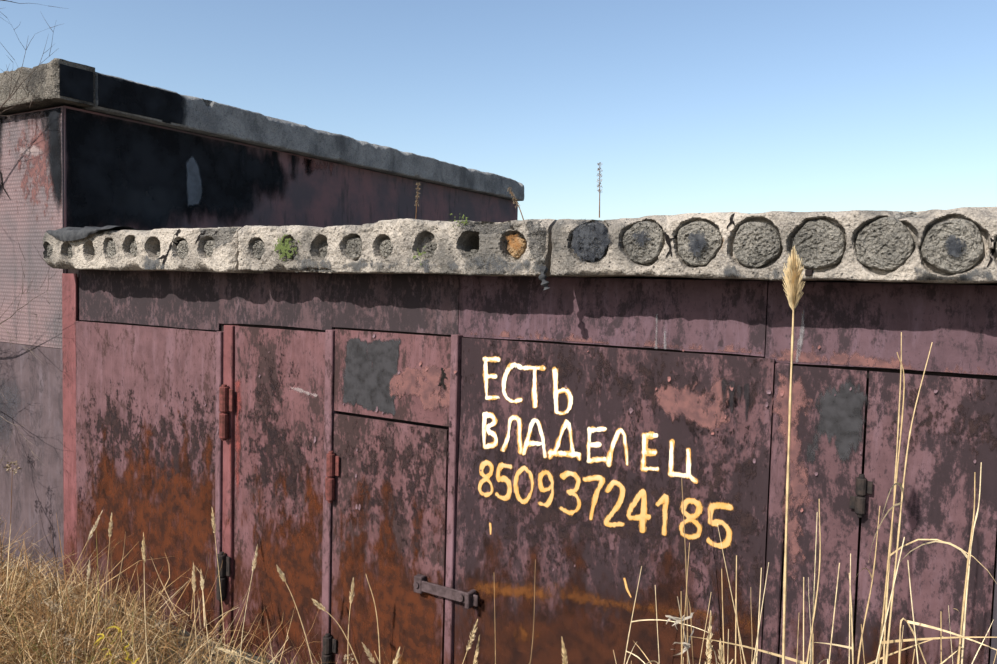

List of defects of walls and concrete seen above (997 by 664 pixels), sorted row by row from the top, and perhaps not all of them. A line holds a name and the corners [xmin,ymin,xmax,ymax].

water stain [20,145,42,157]
corrosion [77,424,215,638]
corrosion [229,464,323,664]
corrosion [337,481,444,664]
corrosion [465,540,758,664]
peeling [339,331,915,618]
peeling [884,369,997,463]